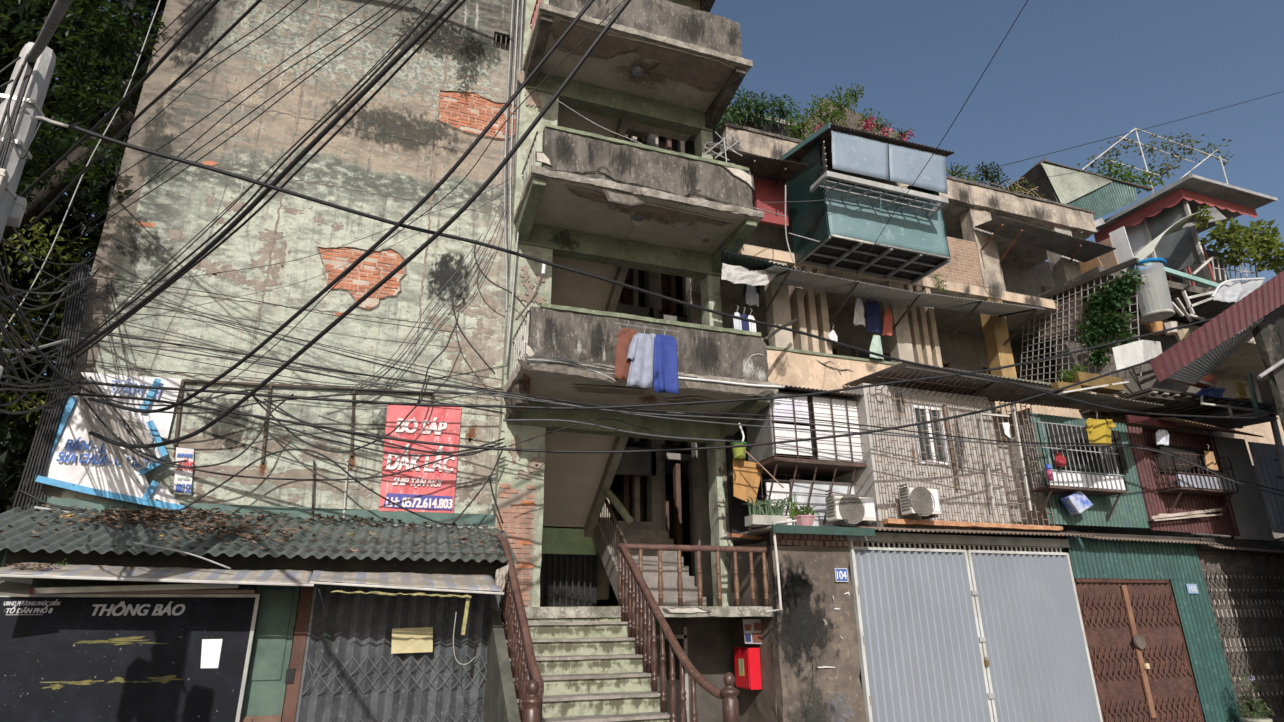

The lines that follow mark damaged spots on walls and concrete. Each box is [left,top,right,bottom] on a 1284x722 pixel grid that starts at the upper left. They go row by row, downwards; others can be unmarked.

water stain [331,100,458,155]
spalling [436,69,542,141]
spalling [283,206,407,316]
water stain [428,253,469,307]
flaking render [454,419,544,607]
water stain [771,557,839,722]